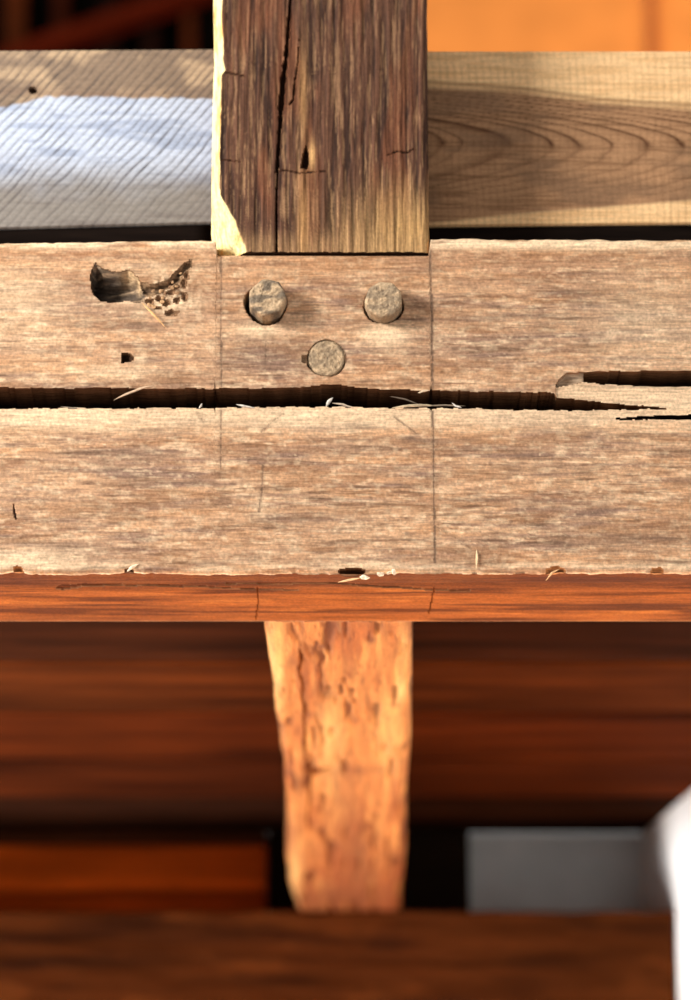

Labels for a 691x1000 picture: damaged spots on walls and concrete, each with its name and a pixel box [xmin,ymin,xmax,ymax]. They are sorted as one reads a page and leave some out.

crack [274,0,301,252]
spalling [90,259,192,316]
crack [0,370,691,421]